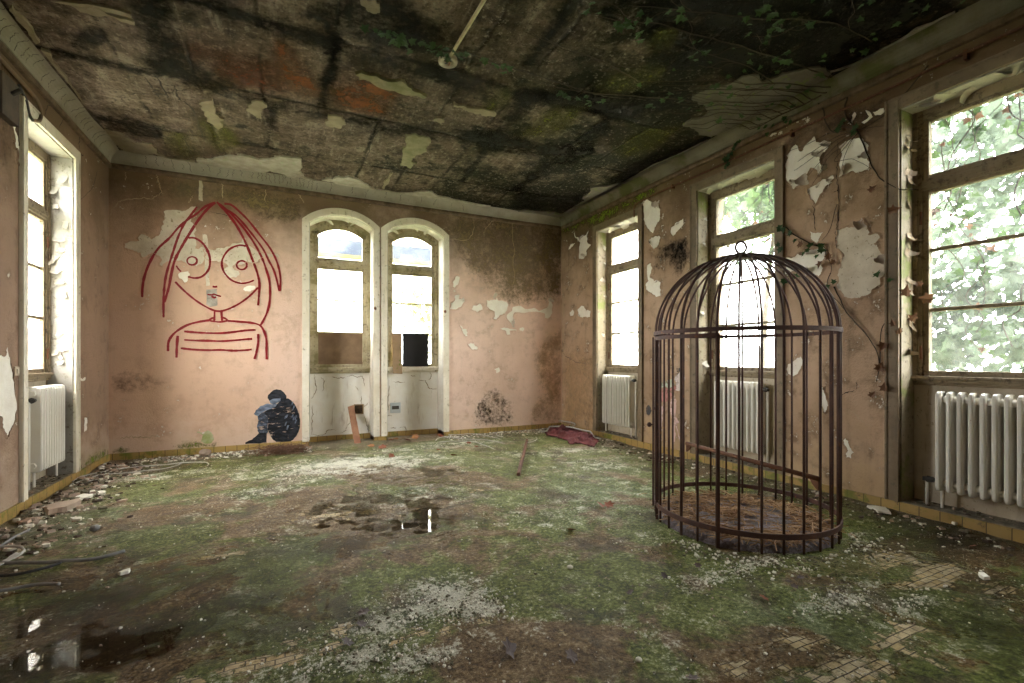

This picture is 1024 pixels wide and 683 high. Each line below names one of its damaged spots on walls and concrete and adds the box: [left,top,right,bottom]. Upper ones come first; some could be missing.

damp [52,0,684,211]
spalling [518,11,955,218]
spalling [104,128,491,207]
damp [605,136,713,185]
peeling [123,205,280,291]
peeling [568,230,607,265]
peeling [608,198,685,298]
damp [655,239,690,272]
spalling [784,217,884,301]
peeling [0,346,18,439]
crack [311,373,432,436]
damp [476,392,510,424]